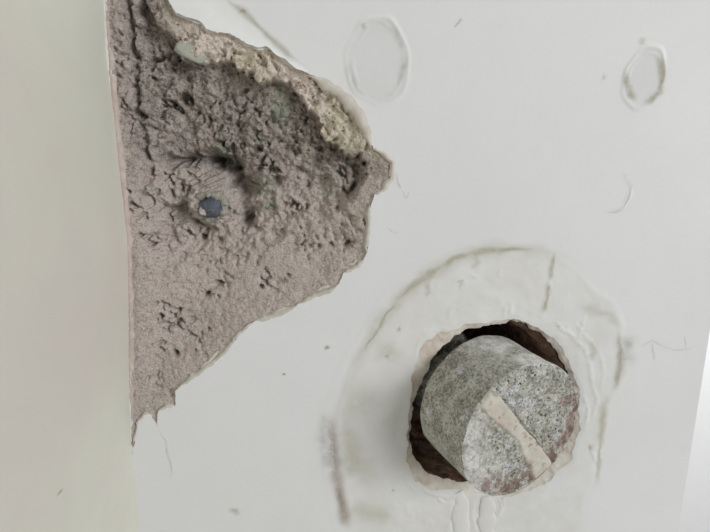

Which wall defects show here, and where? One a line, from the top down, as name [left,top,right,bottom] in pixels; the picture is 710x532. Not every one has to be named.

spalling [105,0,395,448]